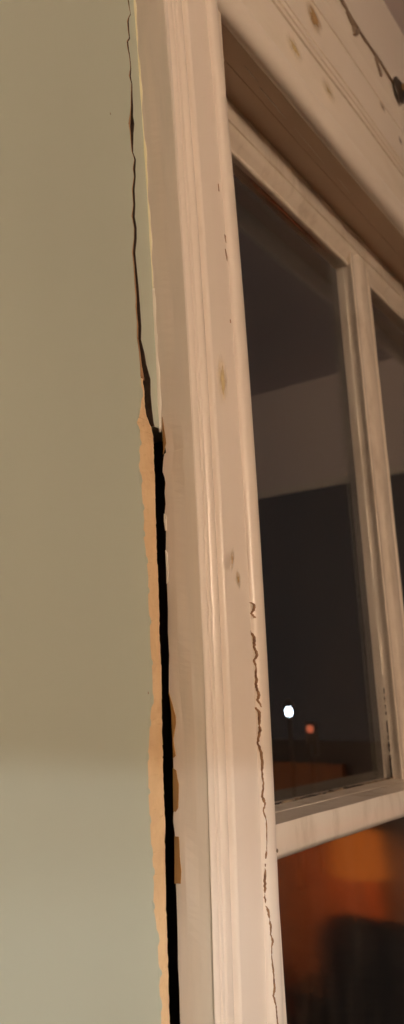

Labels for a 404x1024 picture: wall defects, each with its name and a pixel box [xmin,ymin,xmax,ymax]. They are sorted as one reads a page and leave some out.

crack [127,0,154,427]
flaking render [136,378,181,1024]
crack [249,602,278,1024]